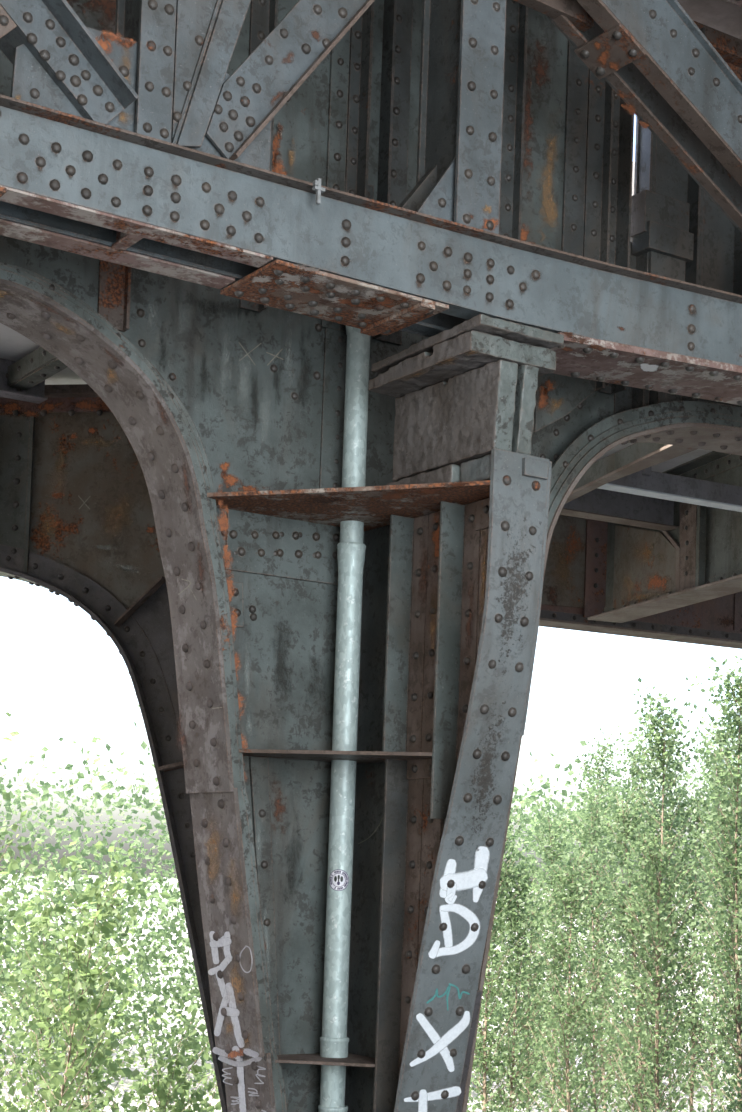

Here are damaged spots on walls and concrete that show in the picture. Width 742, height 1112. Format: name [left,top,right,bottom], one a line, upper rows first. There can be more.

peeling [252,264,383,305]
corrosion [337,281,421,309]
corrosion [561,332,607,352]
peeling [570,349,680,377]
corrosion [370,482,470,502]
corrosion [217,462,267,637]